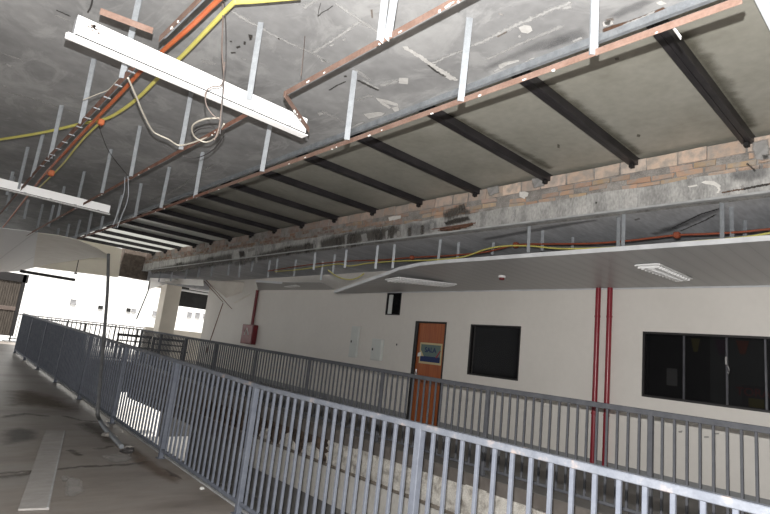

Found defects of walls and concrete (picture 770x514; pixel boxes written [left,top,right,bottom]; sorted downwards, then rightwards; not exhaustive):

crack [403,44,474,81]
peeling [352,98,399,127]
damp [443,204,470,219]